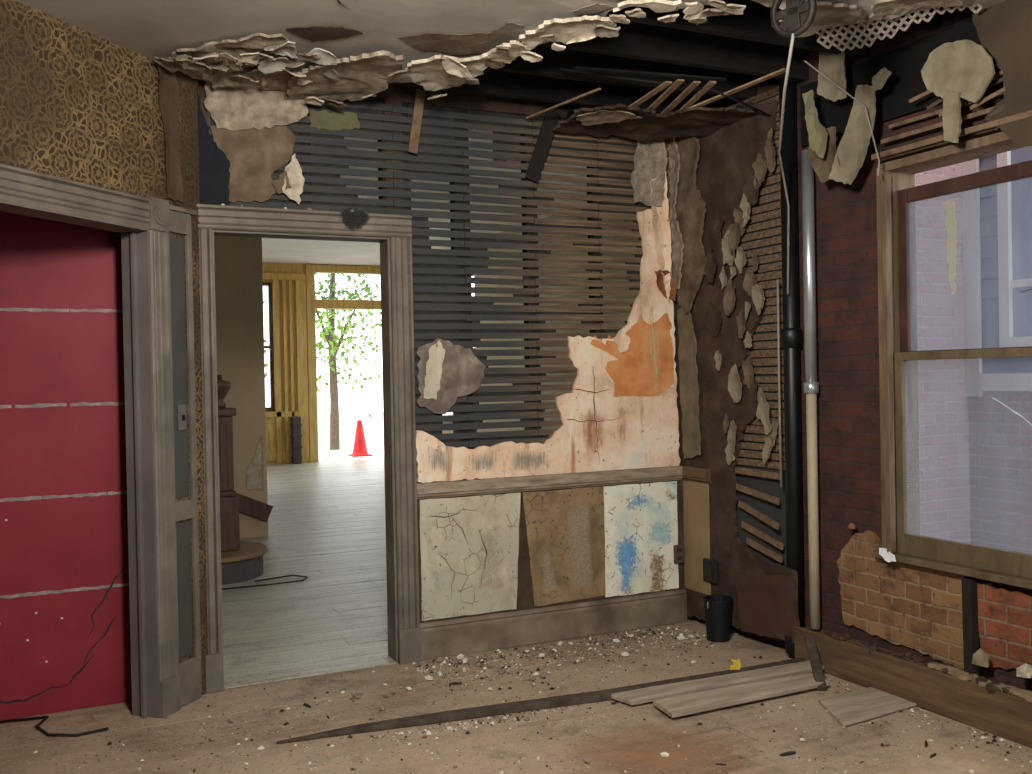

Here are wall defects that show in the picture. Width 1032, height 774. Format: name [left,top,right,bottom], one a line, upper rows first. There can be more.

peeling [398,0,746,85]
flaking render [800,19,1032,160]
spalling [154,26,800,643]
crack [432,509,487,588]
leakage [650,550,666,594]
spalling [837,530,1032,703]